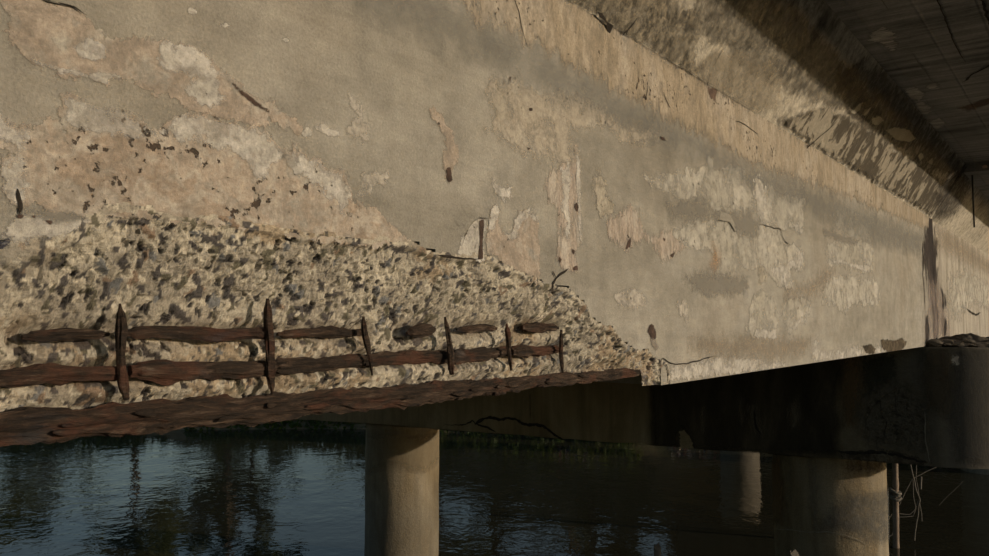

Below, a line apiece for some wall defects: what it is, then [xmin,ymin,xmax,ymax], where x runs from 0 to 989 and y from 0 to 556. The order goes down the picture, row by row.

crack [937,0,989,82]
peeling [464,0,942,341]
leakage [572,0,971,341]
spalling [0,0,786,448]
peeling [810,337,906,363]
crack [444,416,571,442]
leakage [650,358,845,456]
leakage [861,354,925,448]
leakage [951,351,989,463]